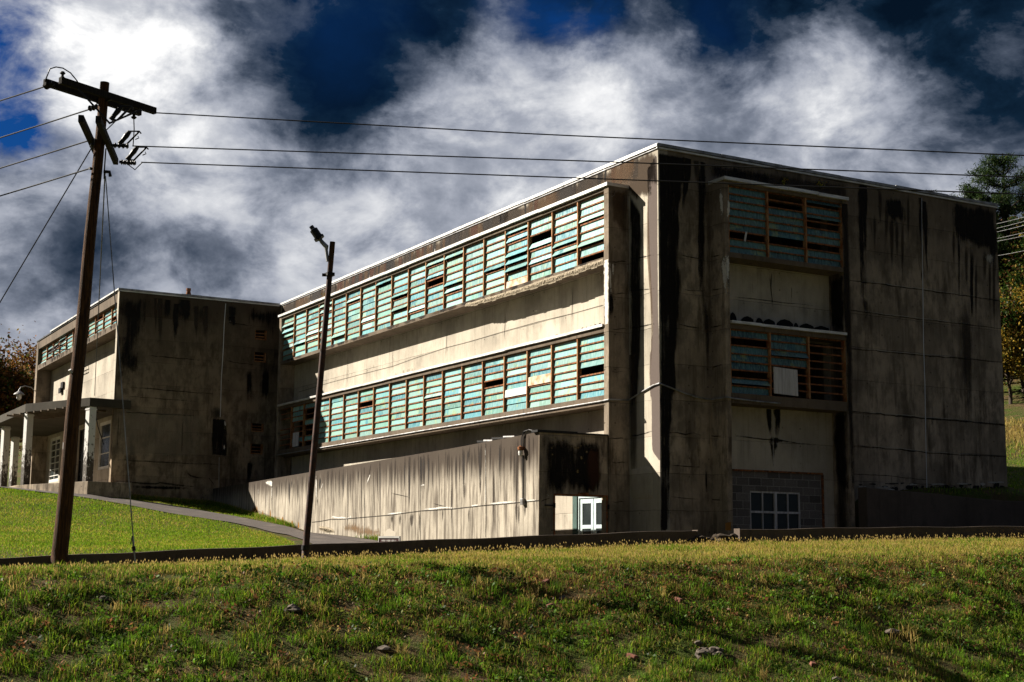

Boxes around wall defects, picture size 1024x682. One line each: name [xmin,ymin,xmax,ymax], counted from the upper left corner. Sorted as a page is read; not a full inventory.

water stain [88,298,208,377]
water stain [247,153,928,531]
water stain [952,204,997,397]